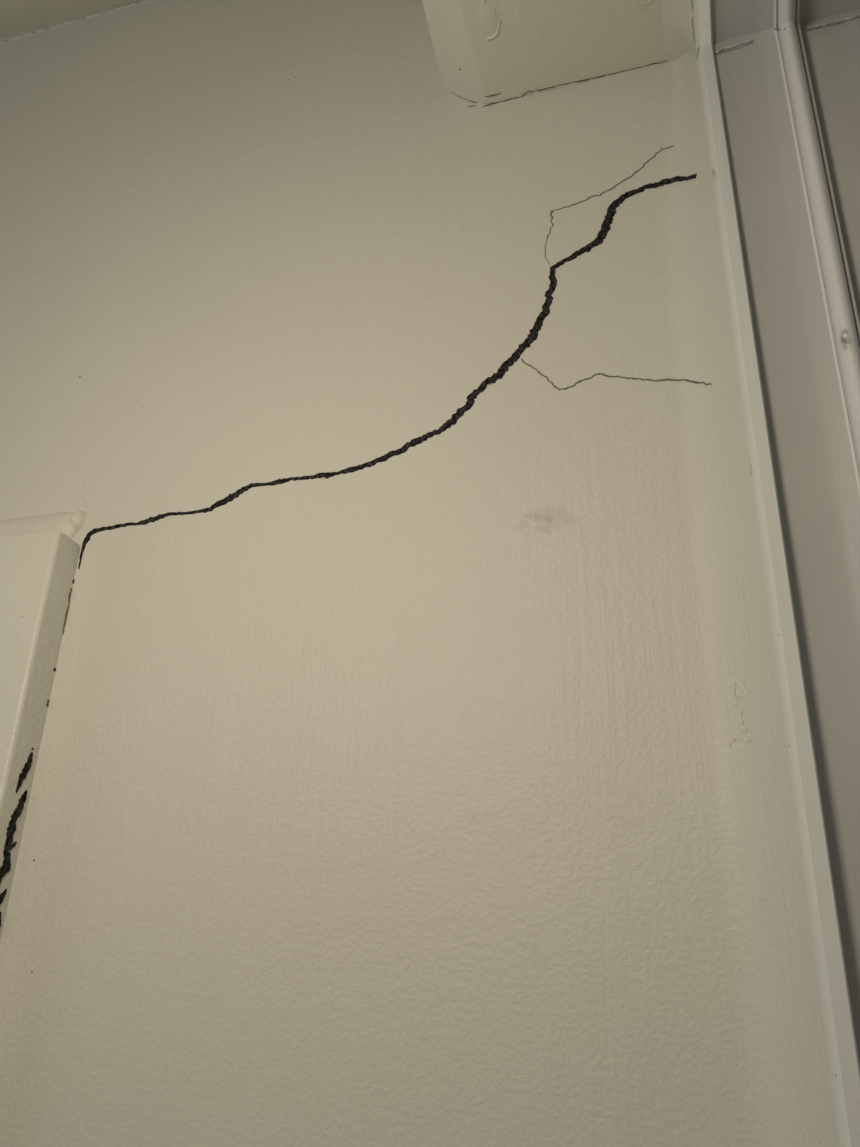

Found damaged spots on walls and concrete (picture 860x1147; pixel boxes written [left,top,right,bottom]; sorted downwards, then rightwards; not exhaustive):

crack [63,145,712,634]
crack [0,748,34,927]